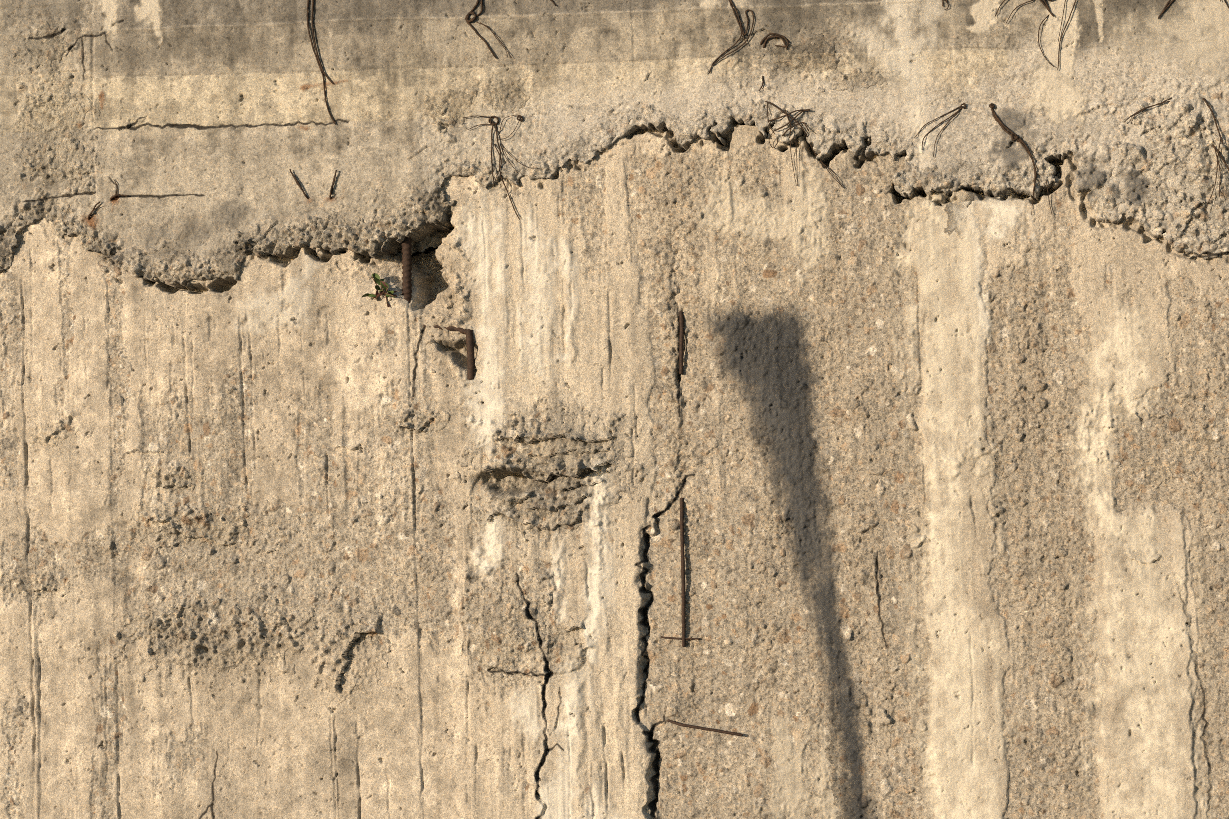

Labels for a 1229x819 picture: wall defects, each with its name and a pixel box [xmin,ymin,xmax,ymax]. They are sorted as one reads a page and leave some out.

damp [98,0,119,34]
damp [134,0,163,43]
damp [967,0,1002,34]
damp [990,0,1088,169]
damp [1093,0,1229,73]
spalling [0,18,1062,388]
spalling [1076,95,1229,248]
spalling [387,410,450,434]
spalling [446,395,647,545]
crack [676,303,684,417]
crack [487,573,564,819]
crack [635,474,695,819]